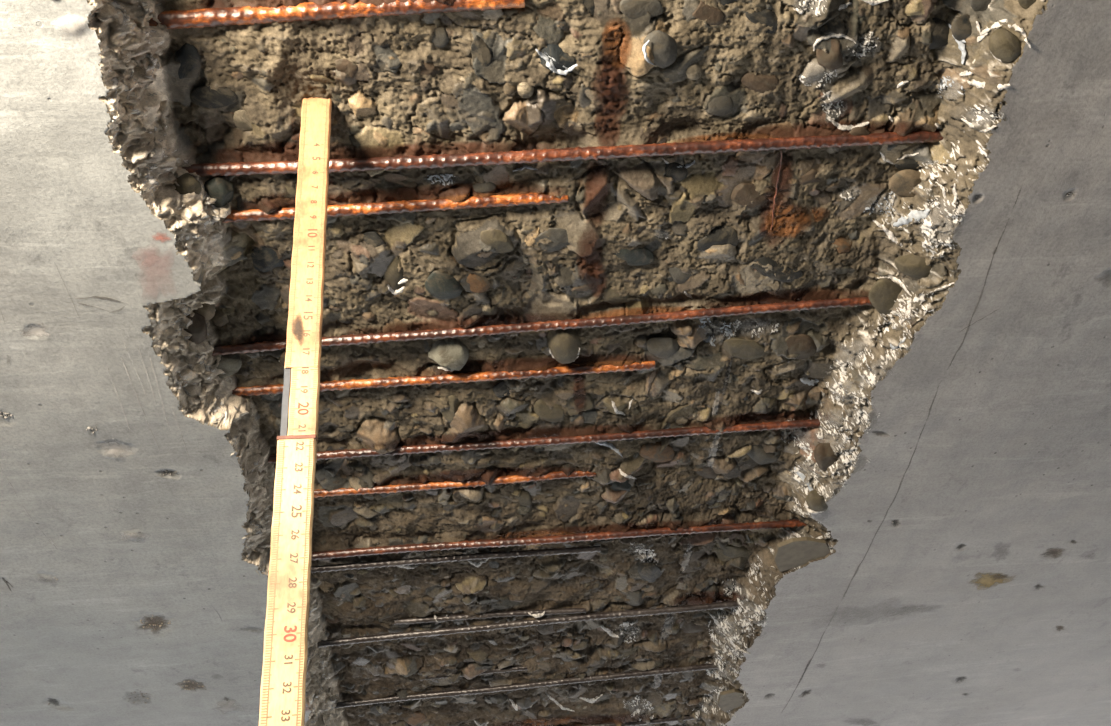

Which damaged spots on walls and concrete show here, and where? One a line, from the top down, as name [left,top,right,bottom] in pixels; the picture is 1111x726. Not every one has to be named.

rust [202,0,456,9]
spalling [158,0,525,29]
rust [595,22,630,145]
rust [216,127,300,162]
rust [330,142,541,159]
spalling [329,131,943,174]
rust [327,185,541,205]
spalling [327,192,568,218]
crack [952,240,1000,361]
spalling [322,294,872,347]
spalling [320,361,655,392]
crack [845,400,934,594]